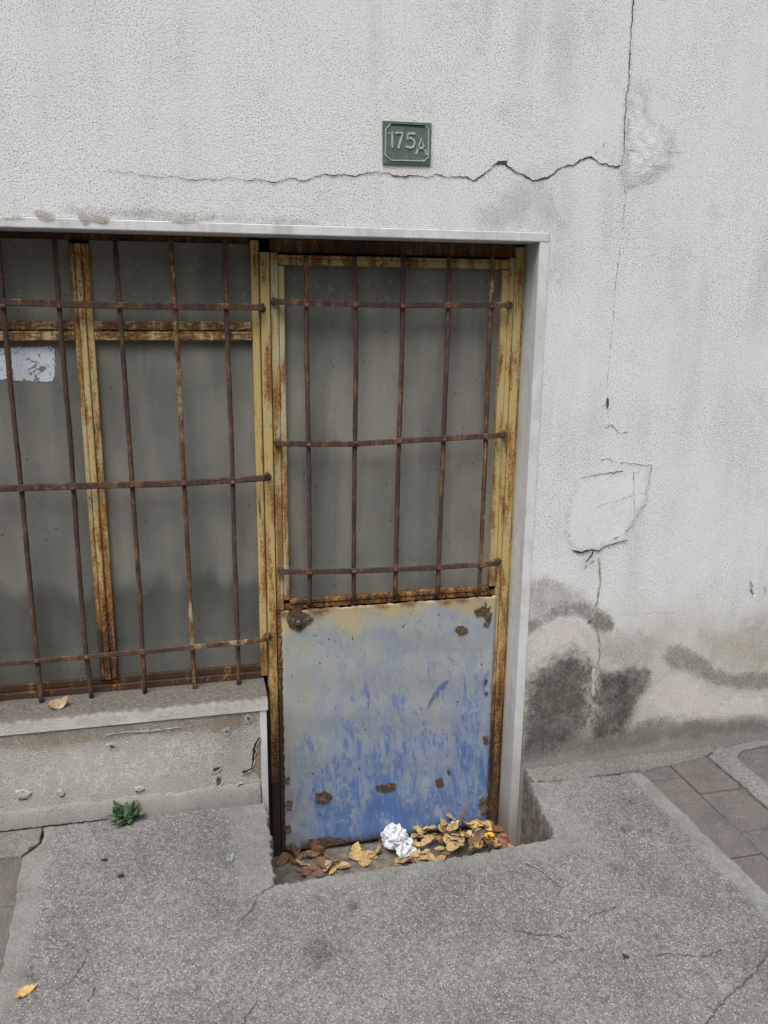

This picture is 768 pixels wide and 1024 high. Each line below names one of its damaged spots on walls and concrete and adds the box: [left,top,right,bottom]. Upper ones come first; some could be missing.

crack [107,0,636,385]
flaking render [565,456,653,553]
rust [286,608,314,632]
rust [473,606,493,627]
crack [584,551,602,699]
leakage [522,583,768,751]
rust [315,791,332,805]
rust [376,783,396,793]